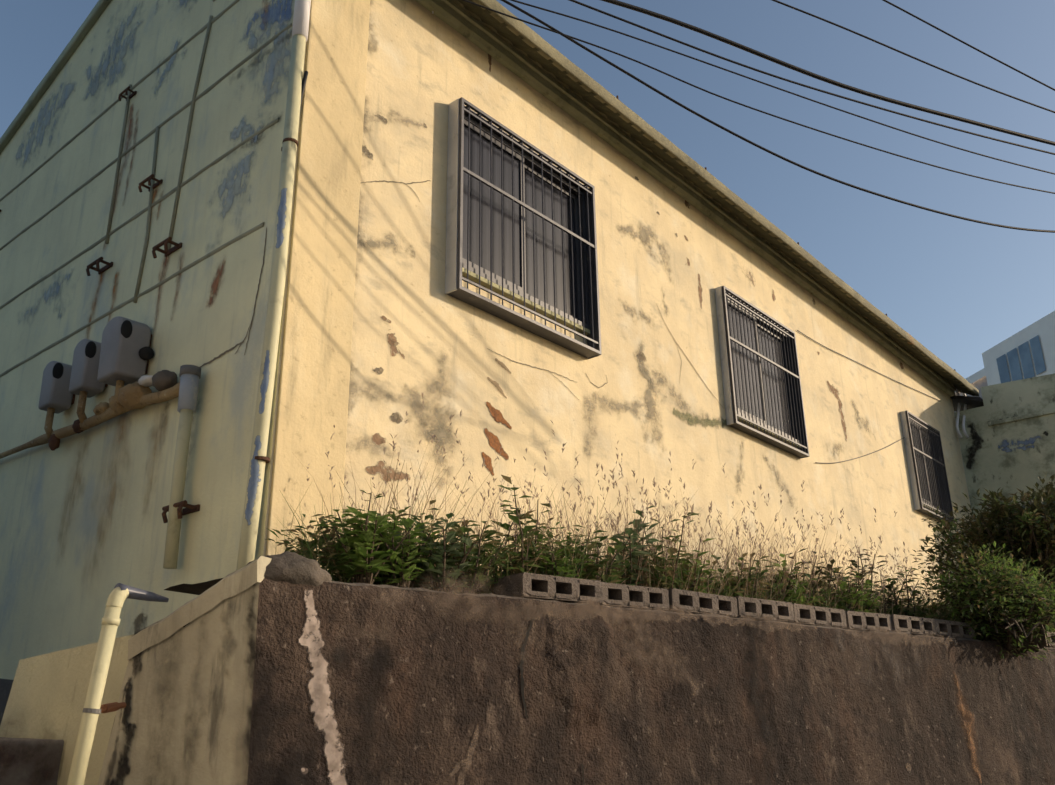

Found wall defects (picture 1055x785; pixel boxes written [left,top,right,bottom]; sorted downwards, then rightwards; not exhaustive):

peeling [276,188,287,248]
crack [361,180,430,199]
peeling [381,316,405,359]
peeling [245,435,261,525]
spalling [372,433,386,445]
damp [411,357,452,485]
spalling [482,402,512,476]
damp [585,345,729,440]
corrosion [827,381,847,441]
damp [966,425,984,469]
damp [104,651,143,785]
corrosion [956,677,981,783]